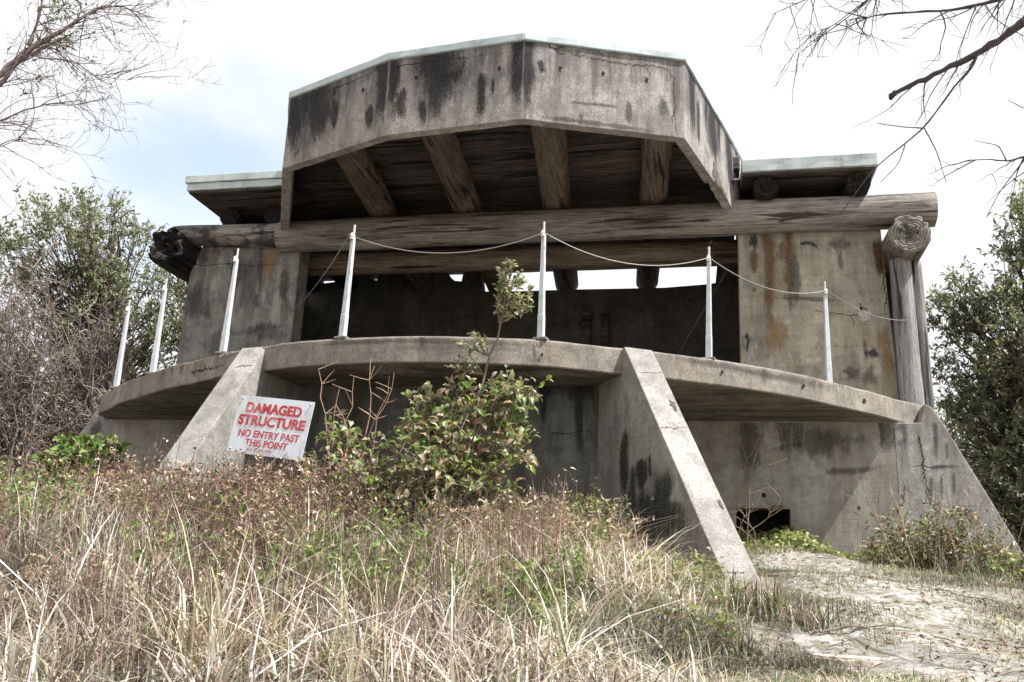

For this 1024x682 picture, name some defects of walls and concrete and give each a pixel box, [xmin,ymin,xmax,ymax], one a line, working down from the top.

water stain [365,52,464,128]
water stain [477,74,495,114]
water stain [512,41,545,102]
water stain [555,102,642,130]
corrosion [750,233,792,349]
corrosion [873,239,883,274]
water stain [619,429,686,547]
crack [878,436,949,508]